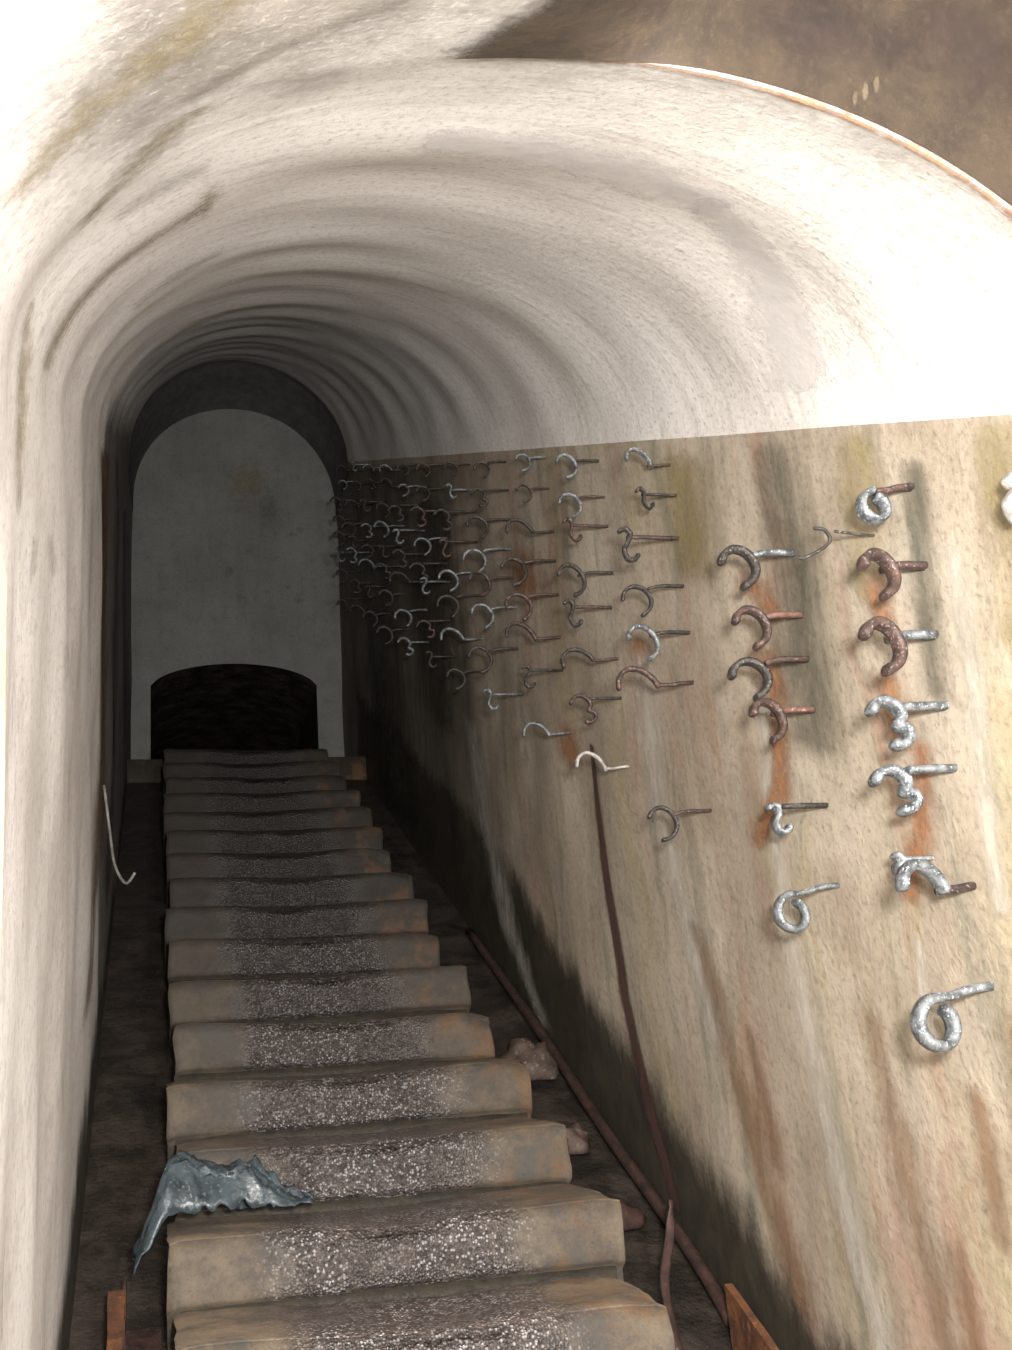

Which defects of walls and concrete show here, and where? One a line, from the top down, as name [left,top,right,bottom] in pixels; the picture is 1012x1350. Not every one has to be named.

rust [766,90,970,183]
leakage [19,319,30,455]
rust [879,676,898,736]
rust [755,722,789,845]
rust [910,744,930,856]
rust [904,872,917,899]